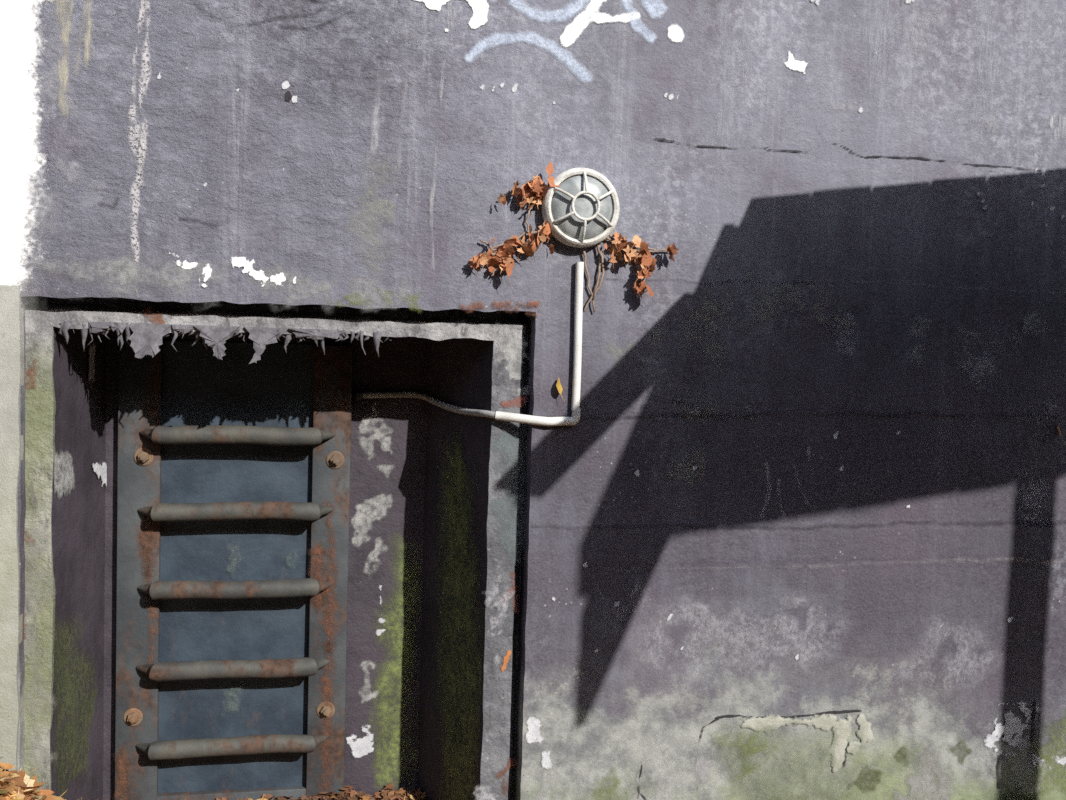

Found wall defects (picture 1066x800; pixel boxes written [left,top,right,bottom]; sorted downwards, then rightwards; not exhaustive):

peeling [466,0,489,29]
water stain [107,0,219,290]
crack [654,138,737,149]
crack [833,143,1041,171]
peeling [169,253,212,287]
peeling [231,257,296,287]
peeling [89,322,345,383]
water stain [669,604,822,674]
peeling [346,725,374,758]
water stain [526,717,554,800]
water stain [895,749,951,800]
water stain [984,701,1039,756]